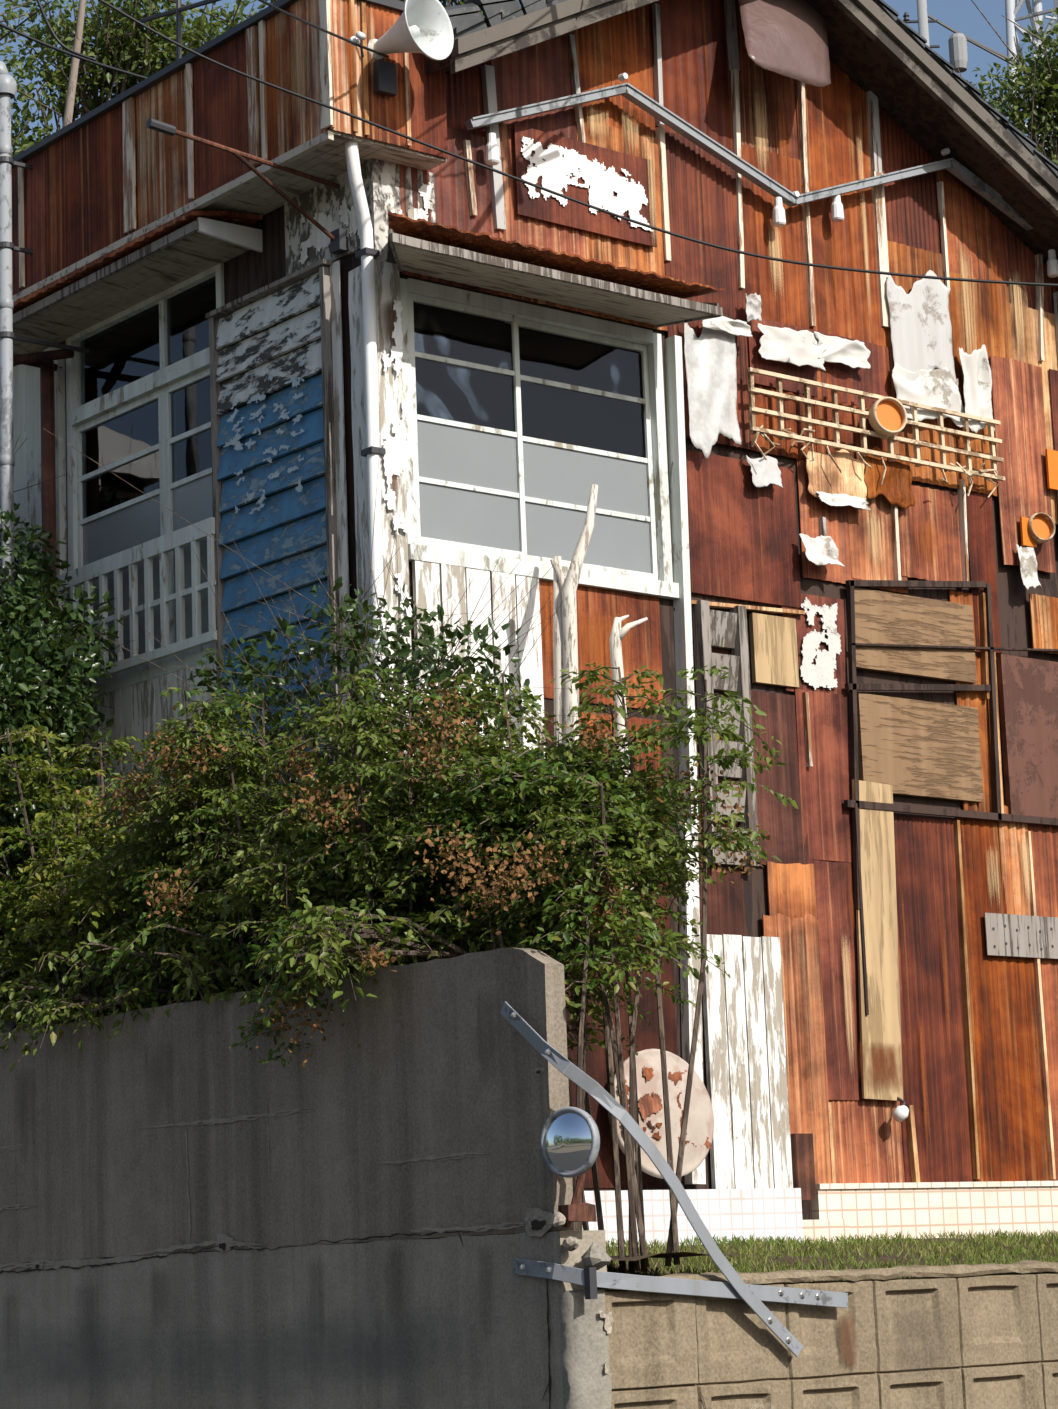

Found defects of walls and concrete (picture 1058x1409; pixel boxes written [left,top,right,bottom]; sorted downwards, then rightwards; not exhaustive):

peeling [299,196,360,264]
peeling [388,182,434,221]
peeling [521,136,653,231]
corrosion [769,222,781,283]
corrosion [832,138,869,302]
corrosion [961,257,974,353]
corrosion [991,264,1024,342]
peeling [223,358,307,514]
peeling [800,597,841,690]
corrosion [843,947,853,1038]
corrosion [625,1066,711,1149]
crack [0,1226,525,1273]